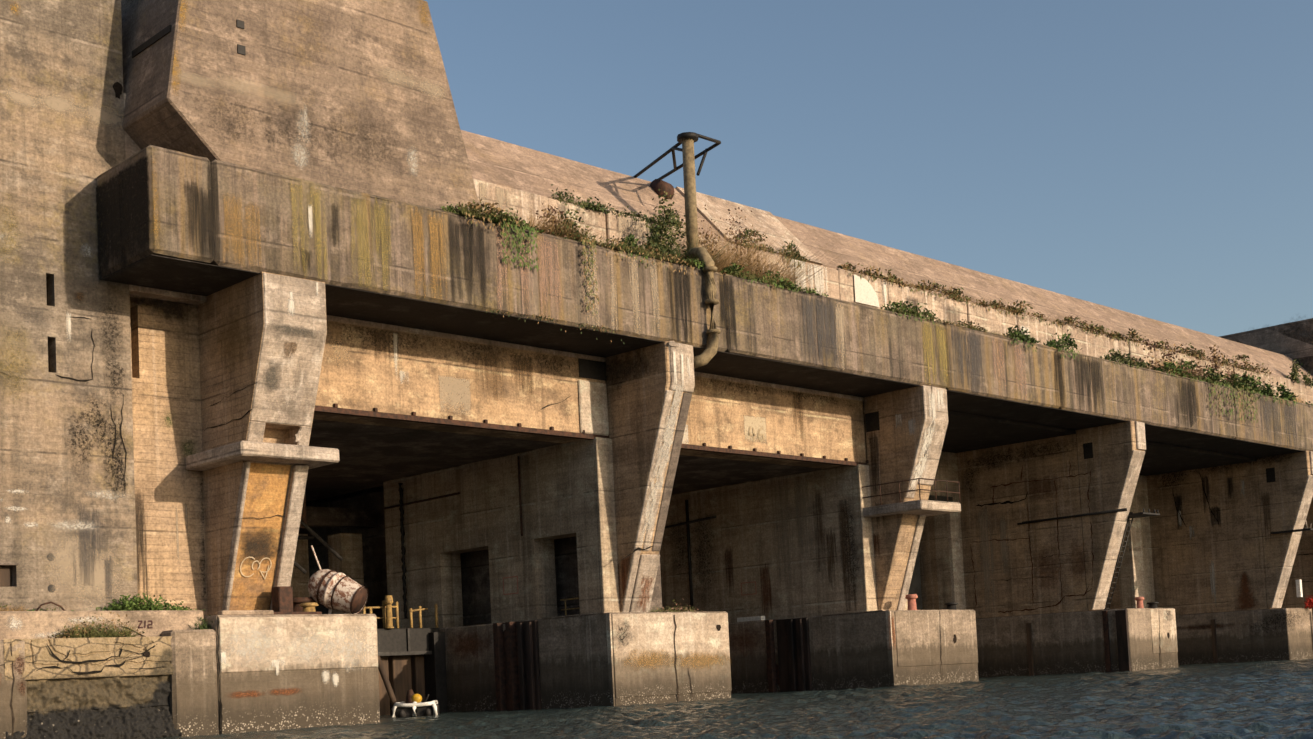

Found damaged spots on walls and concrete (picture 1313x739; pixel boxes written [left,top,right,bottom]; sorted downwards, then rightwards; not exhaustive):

leakage [85,155,150,280]
leakage [184,165,260,257]
leakage [292,189,390,293]
leakage [412,213,561,310]
leakage [618,216,650,240]
leakage [100,304,122,392]
leakage [335,324,422,380]
leakage [719,277,737,349]
leakage [791,260,887,366]
leakage [923,307,1029,389]
leakage [69,400,147,588]
crack [0,626,165,736]